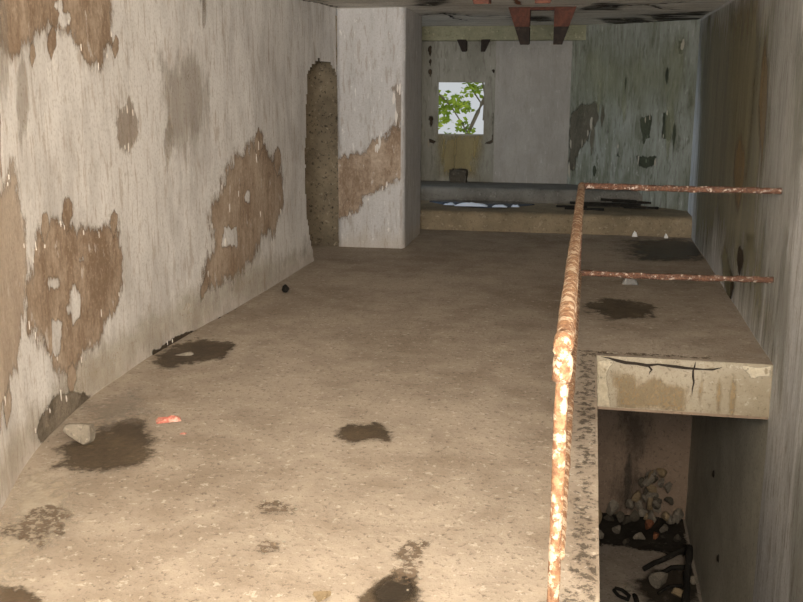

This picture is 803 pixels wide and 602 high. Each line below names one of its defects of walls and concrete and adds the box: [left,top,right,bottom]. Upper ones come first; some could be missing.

peeling [0,0,119,71]
peeling [338,83,401,219]
peeling [200,127,284,300]
peeling [0,120,123,443]
damp [585,298,657,319]
damp [153,337,235,368]
corrosion [614,376,684,411]
crack [601,356,722,392]
damp [53,418,157,472]
damp [334,422,391,443]
damp [0,473,76,602]
damp [358,572,422,602]